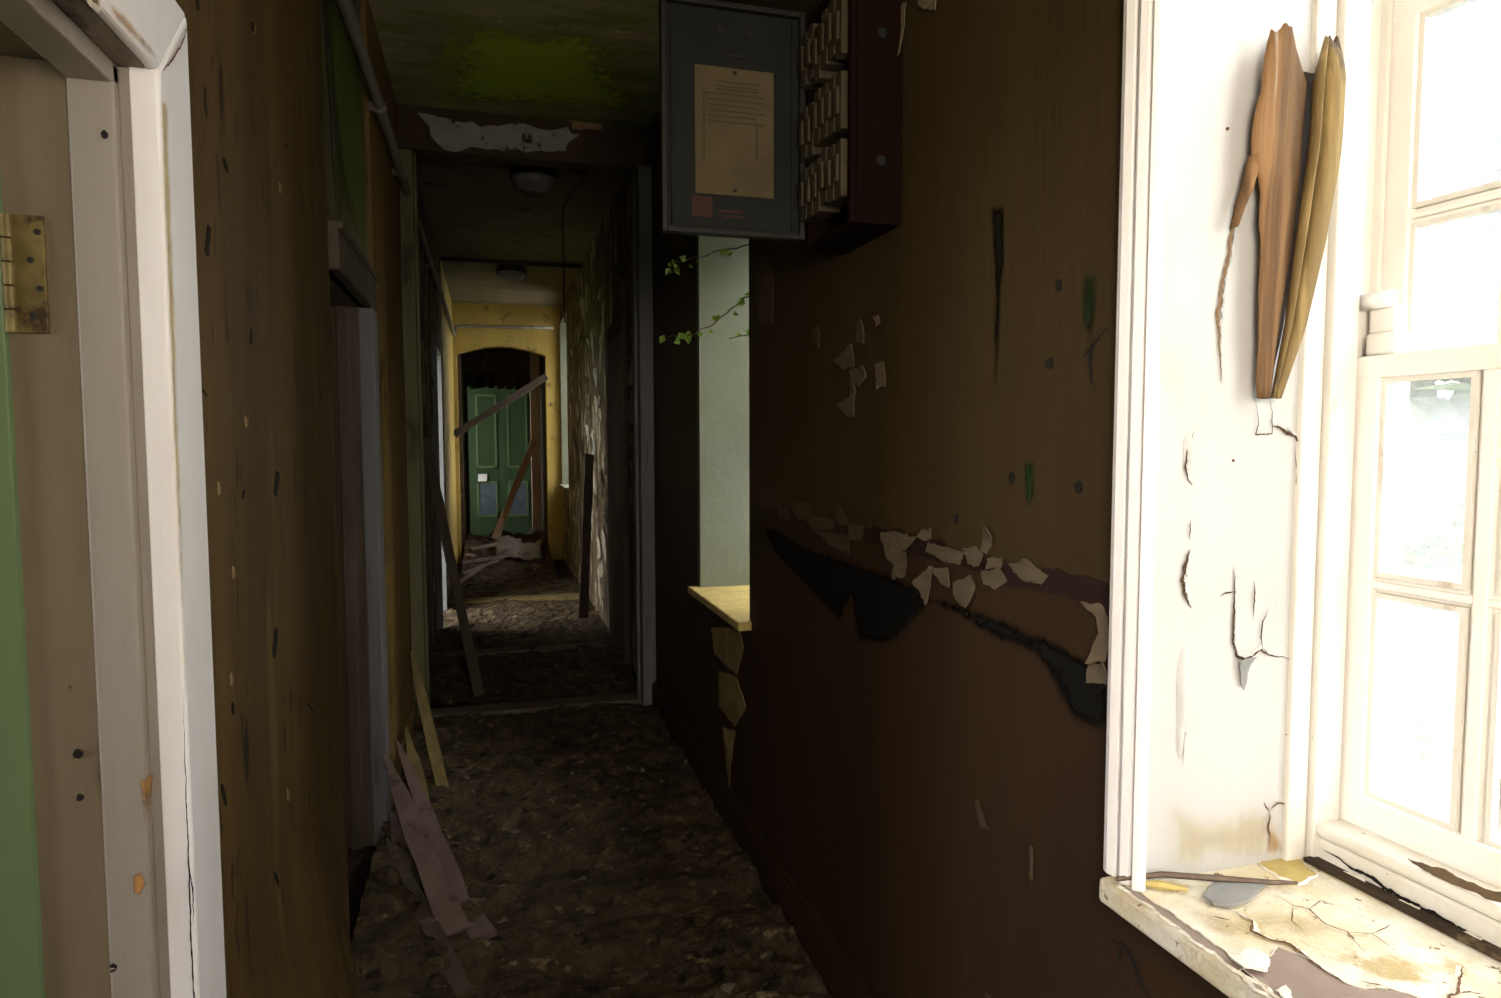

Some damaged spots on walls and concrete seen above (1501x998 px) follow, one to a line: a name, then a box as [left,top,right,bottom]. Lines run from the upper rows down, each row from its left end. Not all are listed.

peeling [86,0,101,14]
peeling [918,0,936,11]
flaking render [417,112,603,152]
peeling [865,525,1110,685]
crack [1180,549,1290,690]
peeling [1258,858,1319,886]
peeling [1408,858,1501,903]
peeling [1117,883,1422,998]
crack [1213,851,1482,998]